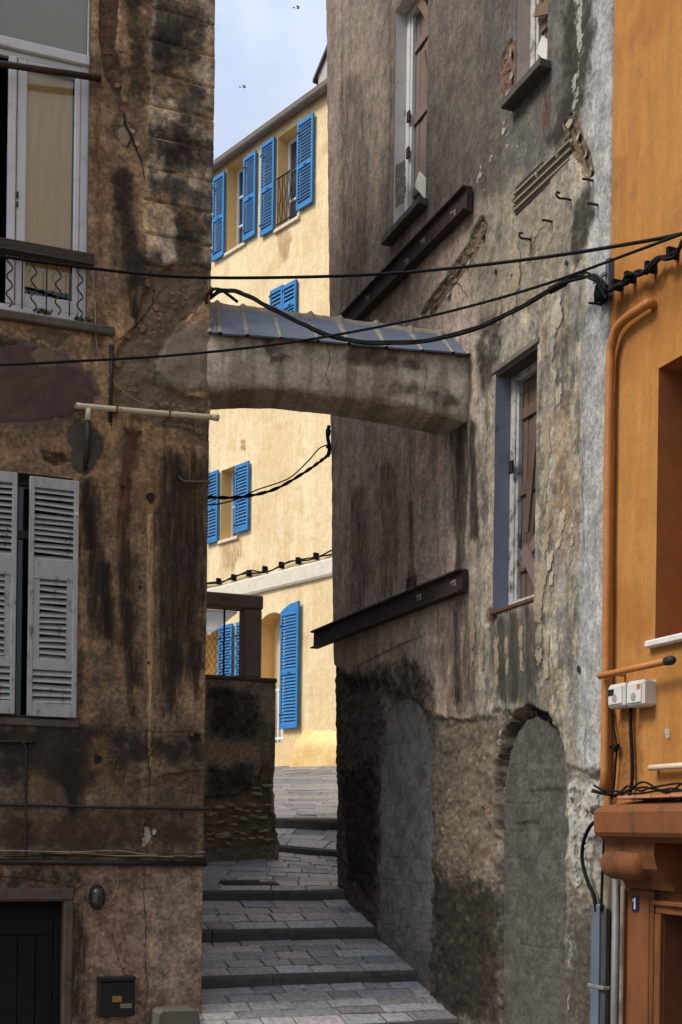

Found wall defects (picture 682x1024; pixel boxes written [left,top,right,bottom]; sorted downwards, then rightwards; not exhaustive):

crack [118,112,145,179]
water stain [128,0,203,104]
water stain [155,121,204,173]
spalling [499,39,516,104]
spalling [512,0,595,216]
spalling [420,215,488,319]
water stain [450,410,478,569]
peeling [468,416,575,690]
water stain [0,420,259,859]
water stain [338,657,434,711]
water stain [437,604,474,711]
spalling [142,827,156,847]